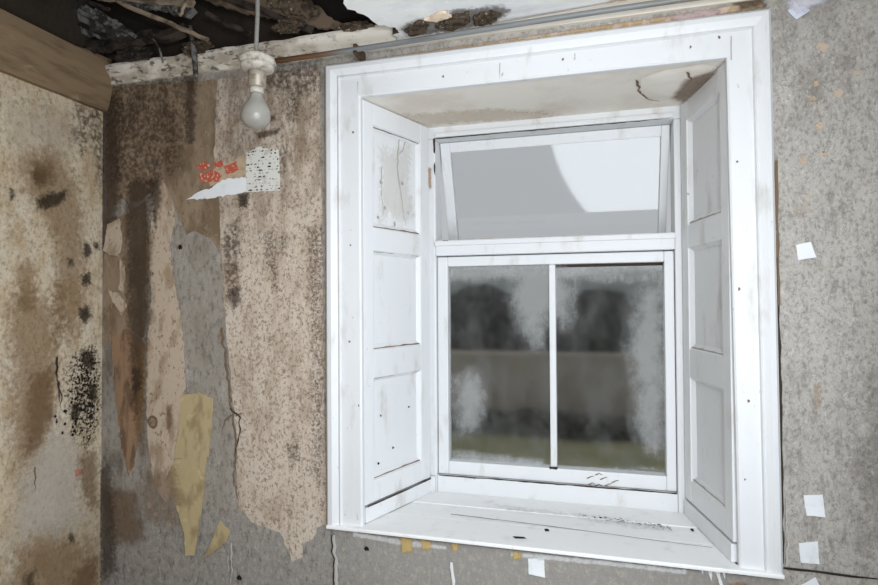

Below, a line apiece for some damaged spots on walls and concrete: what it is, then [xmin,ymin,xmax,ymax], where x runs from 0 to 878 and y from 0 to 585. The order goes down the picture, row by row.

damp [267,66,316,121]
peeling [103,218,127,316]
damp [71,79,195,414]
damp [19,344,100,542]
peeling [164,392,213,556]